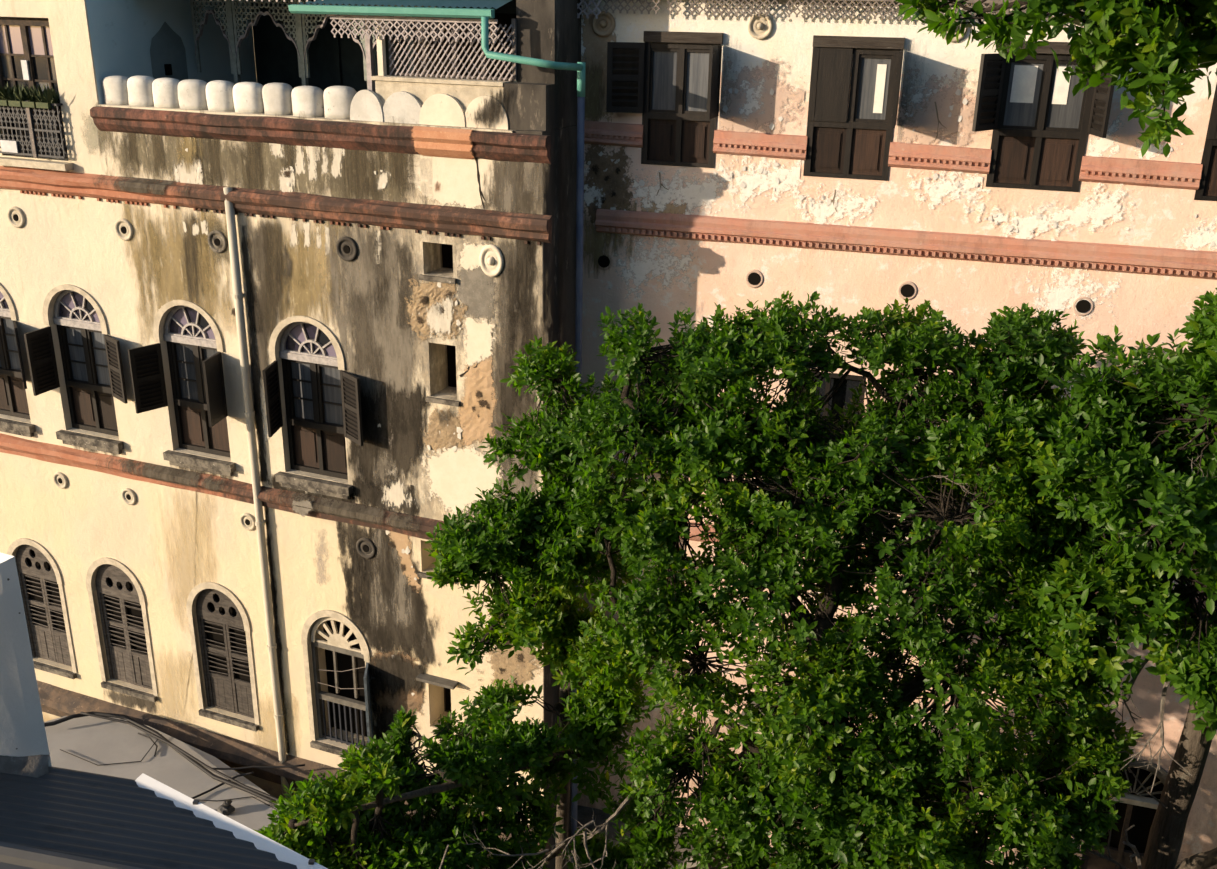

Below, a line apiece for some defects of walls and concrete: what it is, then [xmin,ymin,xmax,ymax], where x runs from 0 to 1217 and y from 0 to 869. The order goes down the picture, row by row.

peeling [720,58,805,134]
damp [85,105,415,202]
flaking render [584,144,878,226]
peeling [906,171,1135,241]
flaking render [404,276,468,340]
flaking render [423,356,498,452]
damp [490,237,548,501]
damp [74,446,231,493]
damp [182,214,439,754]
damp [475,614,543,691]